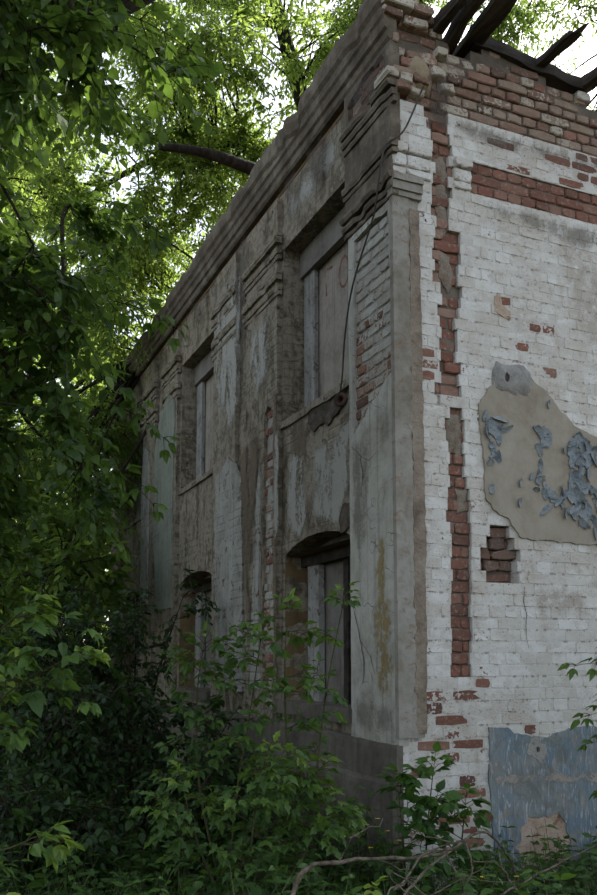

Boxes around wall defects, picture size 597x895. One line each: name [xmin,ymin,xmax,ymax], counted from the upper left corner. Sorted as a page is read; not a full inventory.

flaking render [471,153,597,225]
flaking render [308,215,391,432]
spalling [409,208,490,762]
peeling [483,409,514,466]
peeling [519,425,597,540]
spalling [480,527,515,583]
leakage [375,540,392,692]
spalling [515,813,571,872]